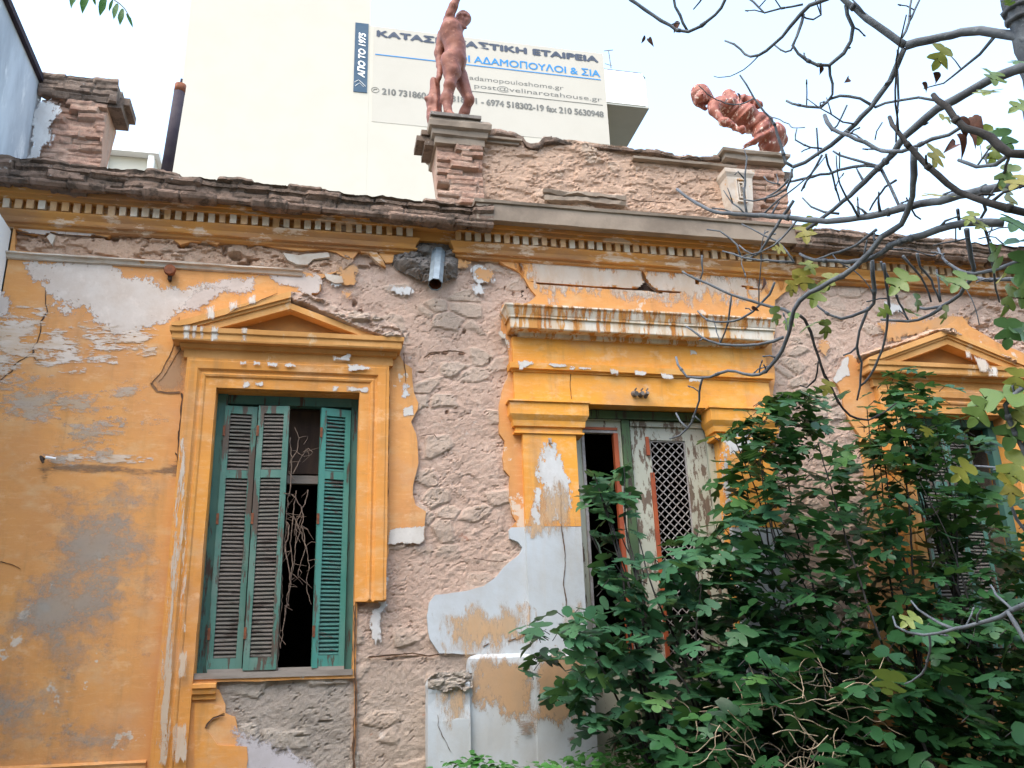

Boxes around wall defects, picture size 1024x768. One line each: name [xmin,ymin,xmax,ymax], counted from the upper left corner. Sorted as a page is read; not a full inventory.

crack [0,290,48,381]
spalling [0,229,766,768]
spalling [718,285,1024,679]